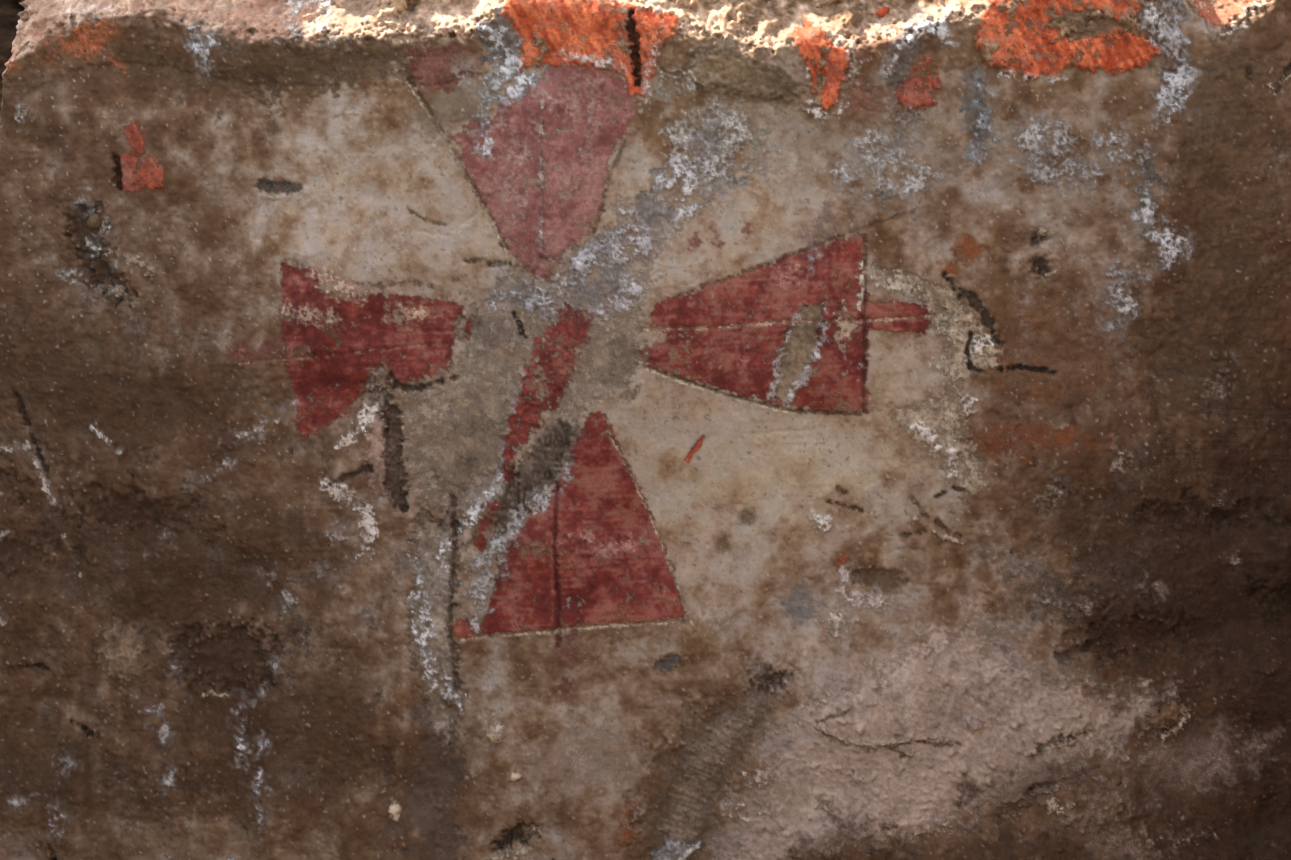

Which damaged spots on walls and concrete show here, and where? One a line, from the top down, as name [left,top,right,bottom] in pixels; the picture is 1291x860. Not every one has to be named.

water stain [477,14,542,158]
flaking render [501,0,678,102]
flaking render [790,19,858,118]
water stain [882,16,954,89]
flaking render [895,57,941,111]
flaking render [974,0,1162,84]
flaking render [1194,0,1260,36]
water stain [660,99,780,188]
water stain [832,105,939,200]
water stain [946,0,1291,860]
water stain [808,511,840,532]
water stain [782,566,891,639]